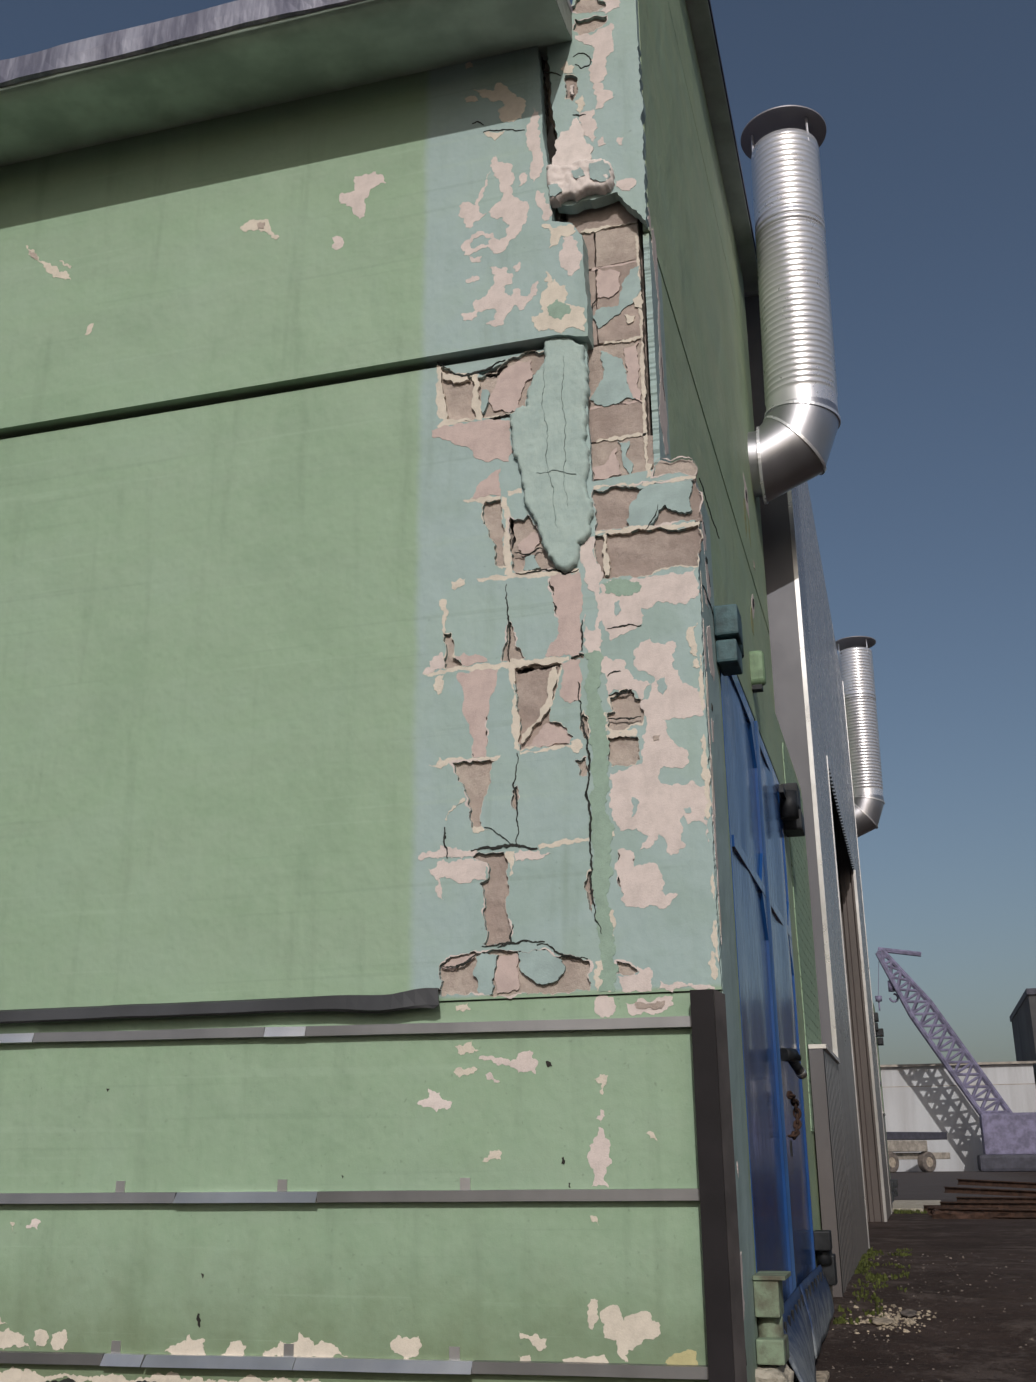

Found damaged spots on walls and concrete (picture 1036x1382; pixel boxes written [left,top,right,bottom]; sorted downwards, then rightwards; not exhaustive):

crack [541,56,560,164]
spalling [422,0,722,1018]
crack [501,584,525,662]
crack [418,620,602,934]
peeling [454,1041,538,1083]
peeling [587,1074,612,1187]
peeling [0,1317,68,1350]
peeling [0,1366,321,1382]
peeling [165,1334,246,1355]
peeling [263,1332,348,1357]
peeling [390,1335,422,1359]
peeling [563,1299,661,1363]